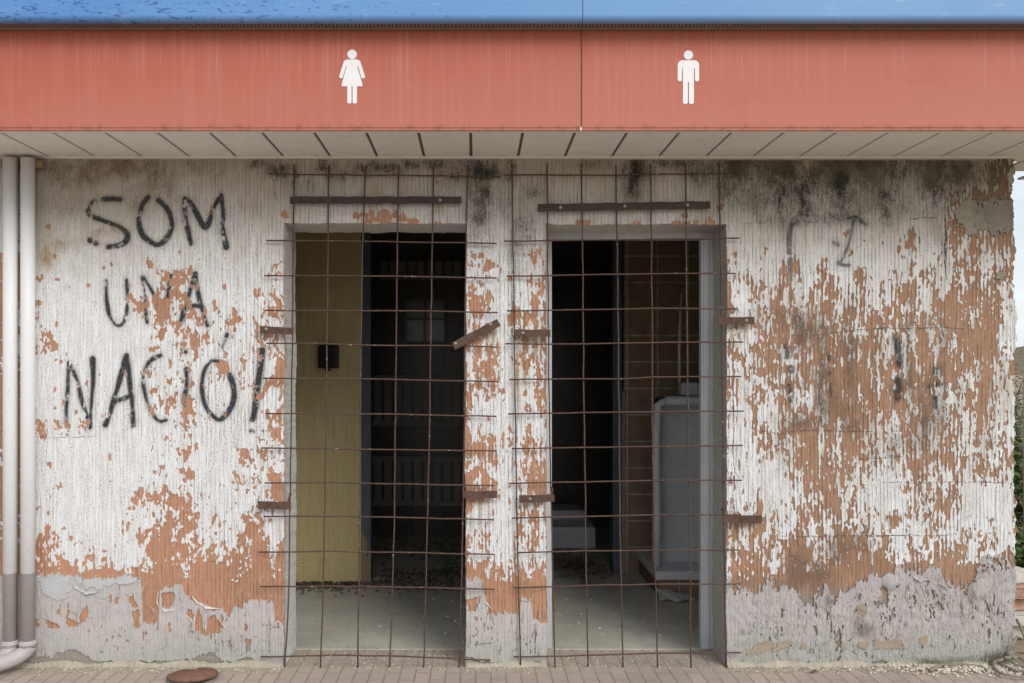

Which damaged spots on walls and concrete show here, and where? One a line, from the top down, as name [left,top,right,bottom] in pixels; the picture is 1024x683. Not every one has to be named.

peeling [24,250,285,664]
peeling [337,209,465,224]
leakage [318,160,516,226]
peeling [465,244,547,666]
leakage [621,160,1001,224]
peeling [726,159,1017,664]